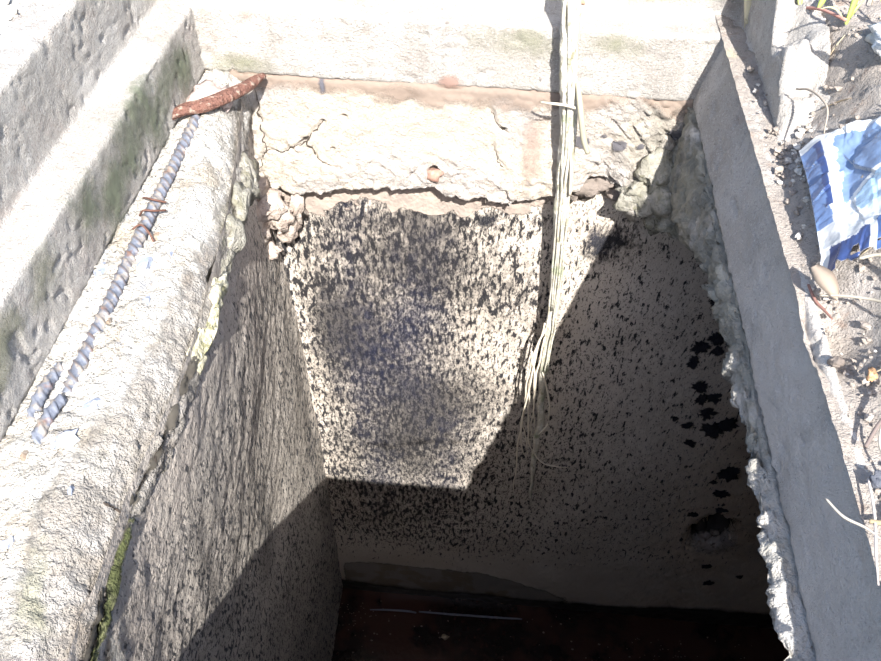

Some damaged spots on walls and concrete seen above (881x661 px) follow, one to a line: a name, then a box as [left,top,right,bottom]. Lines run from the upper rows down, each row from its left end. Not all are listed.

spalling [197,67,242,88]
crack [255,91,330,172]
spalling [570,97,685,202]
damp [583,220,643,268]
spalling [0,82,560,652]
damp [308,204,500,494]
damp [686,328,725,369]
damp [672,381,740,448]
damp [709,467,741,514]
spalling [691,513,735,554]
peeling [107,635,126,661]